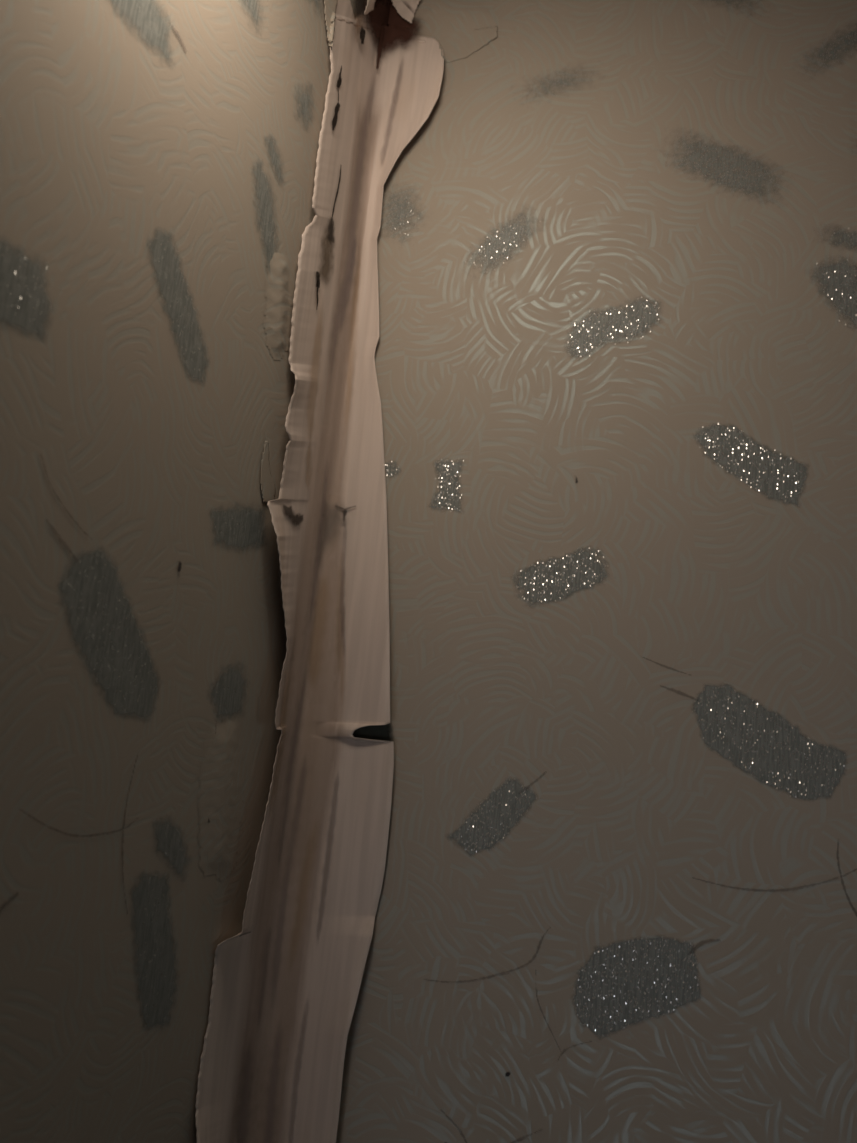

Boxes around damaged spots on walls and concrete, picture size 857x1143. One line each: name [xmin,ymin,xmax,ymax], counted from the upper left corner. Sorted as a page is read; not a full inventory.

peeling [391,0,421,23]